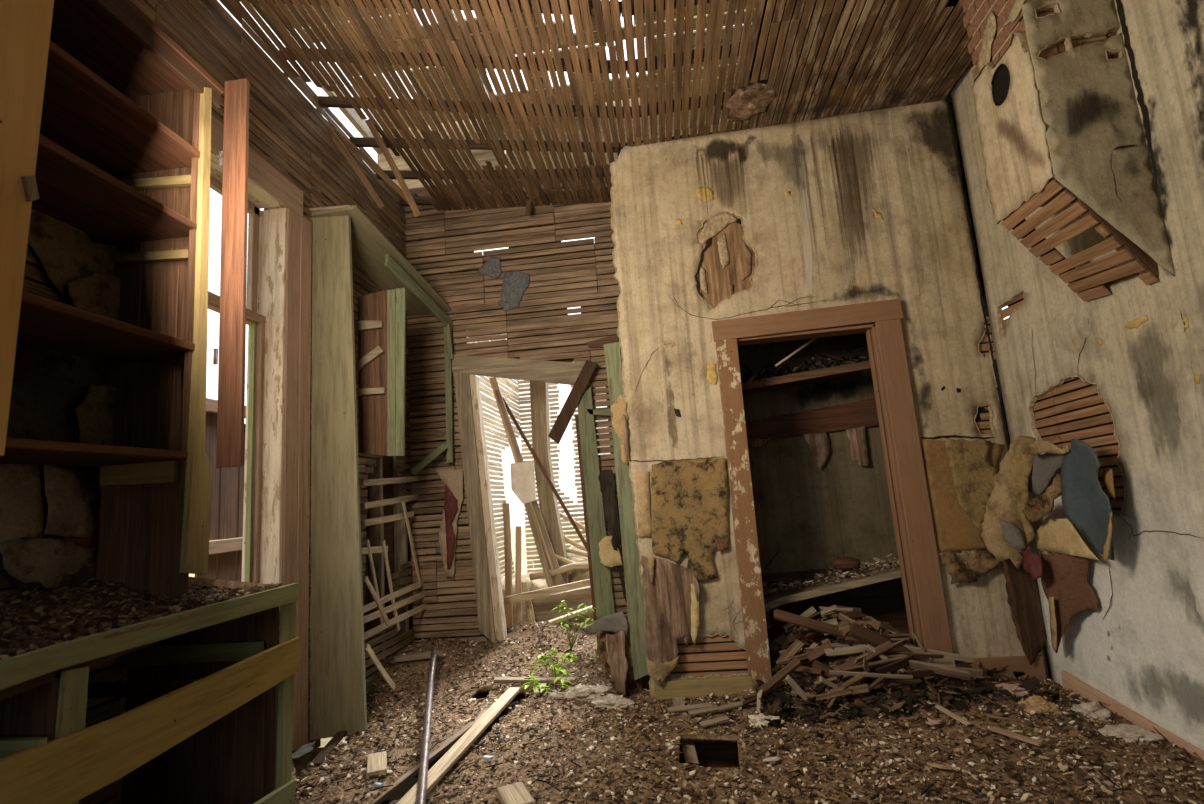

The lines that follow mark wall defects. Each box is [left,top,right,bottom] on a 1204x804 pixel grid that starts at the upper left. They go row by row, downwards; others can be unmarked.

flaking render [973,31,1069,82]
crack [1110,0,1152,205]
damp [706,137,753,162]
damp [914,110,958,177]
flaking render [694,187,758,309]
damp [847,286,890,298]
flaking render [977,290,1024,359]
flaking render [974,404,996,435]
flaking render [1028,375,1127,517]
crack [1119,516,1203,541]